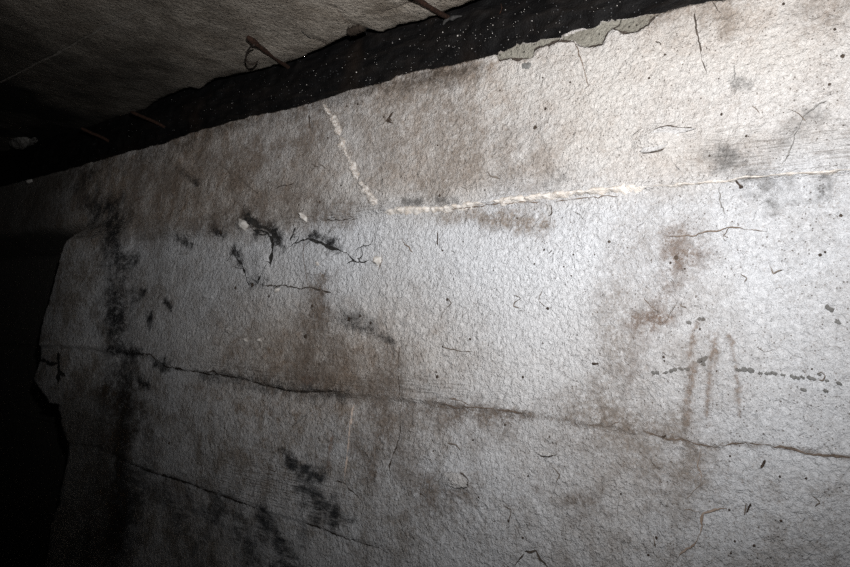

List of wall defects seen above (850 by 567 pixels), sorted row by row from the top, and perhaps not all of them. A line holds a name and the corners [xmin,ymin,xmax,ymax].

spalling [496,14,661,69]
damp [129,102,378,239]
crack [218,163,383,294]
damp [384,169,850,226]
crack [674,186,760,240]
crack [782,101,825,163]
crack [134,353,351,435]
crack [440,398,521,414]
damp [684,326,697,426]
damp [281,448,339,527]
crack [645,431,848,557]
damp [256,507,296,567]